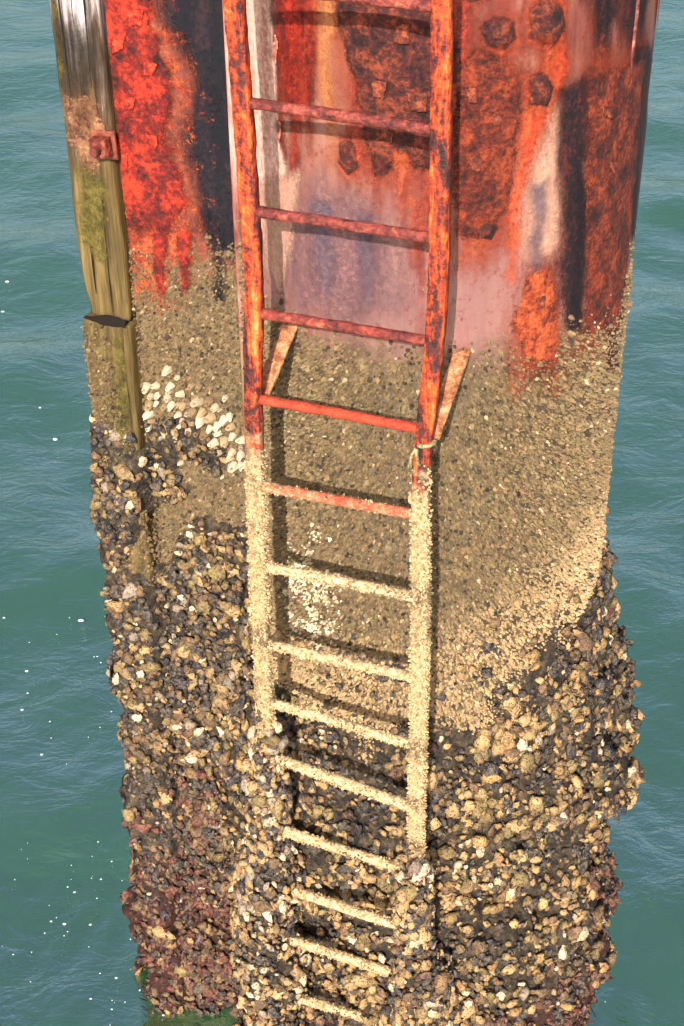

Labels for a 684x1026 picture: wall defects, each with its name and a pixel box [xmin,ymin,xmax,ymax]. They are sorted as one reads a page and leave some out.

rust [61,0,208,322]